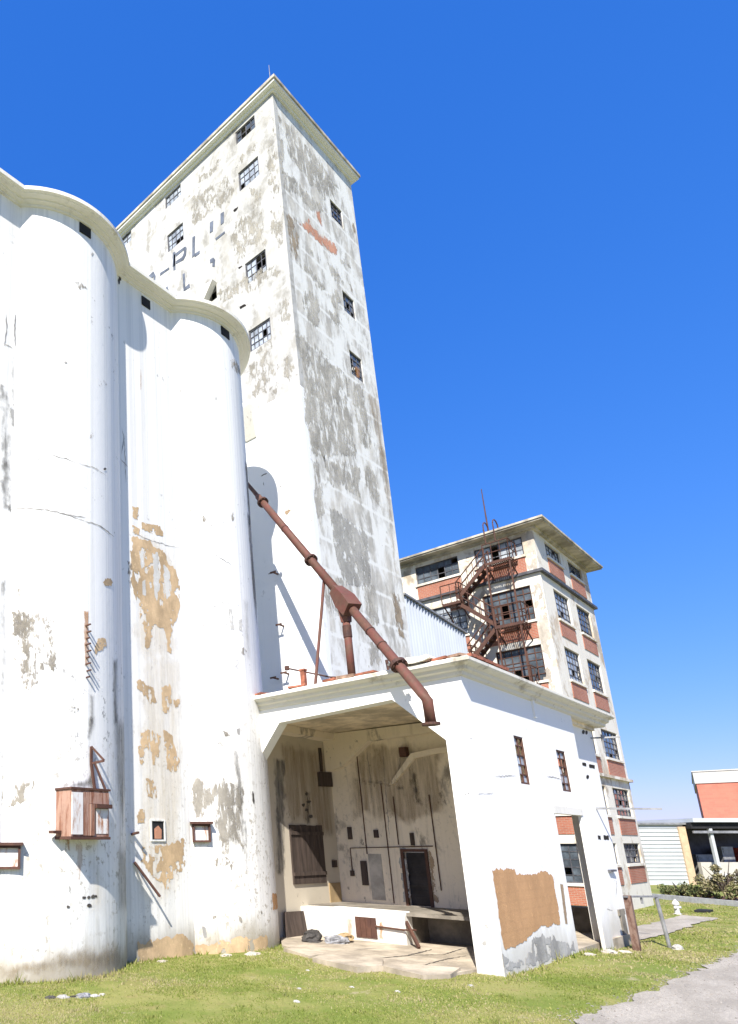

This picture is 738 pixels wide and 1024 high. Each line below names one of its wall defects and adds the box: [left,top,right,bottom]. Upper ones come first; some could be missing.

peeling [191,116,351,327]
peeling [127,506,180,653]
peeling [137,679,193,713]
peeling [138,729,180,772]
peeling [141,838,186,889]
spalling [137,915,268,962]
peeling [485,868,576,972]